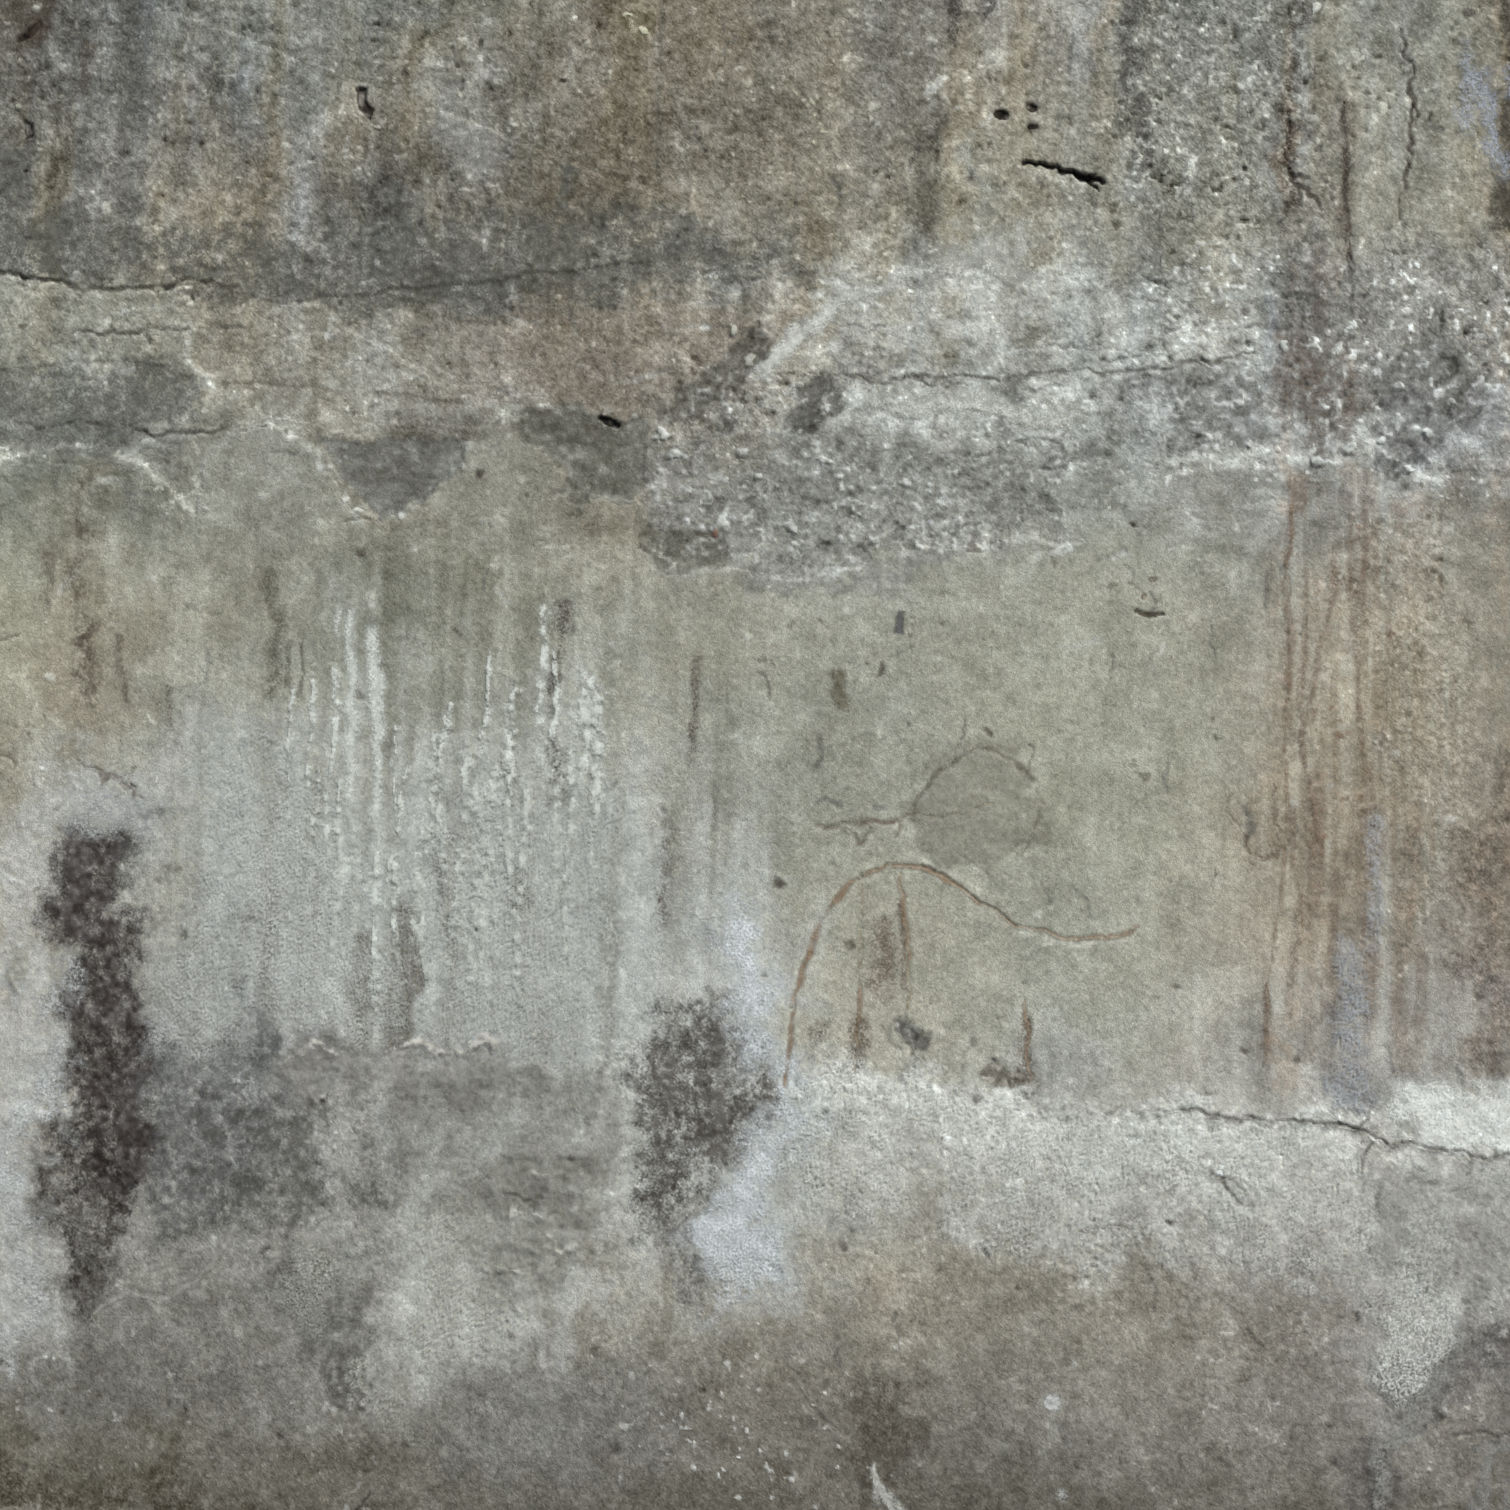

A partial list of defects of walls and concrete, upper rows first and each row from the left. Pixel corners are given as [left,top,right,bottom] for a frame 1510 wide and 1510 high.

crack [1022,161,1105,190]
crack [854,373,933,384]
water stain [0,570,639,1424]
crack [784,819,1133,1086]
water stain [408,896,1510,1510]
crack [1166,1109,1504,1161]